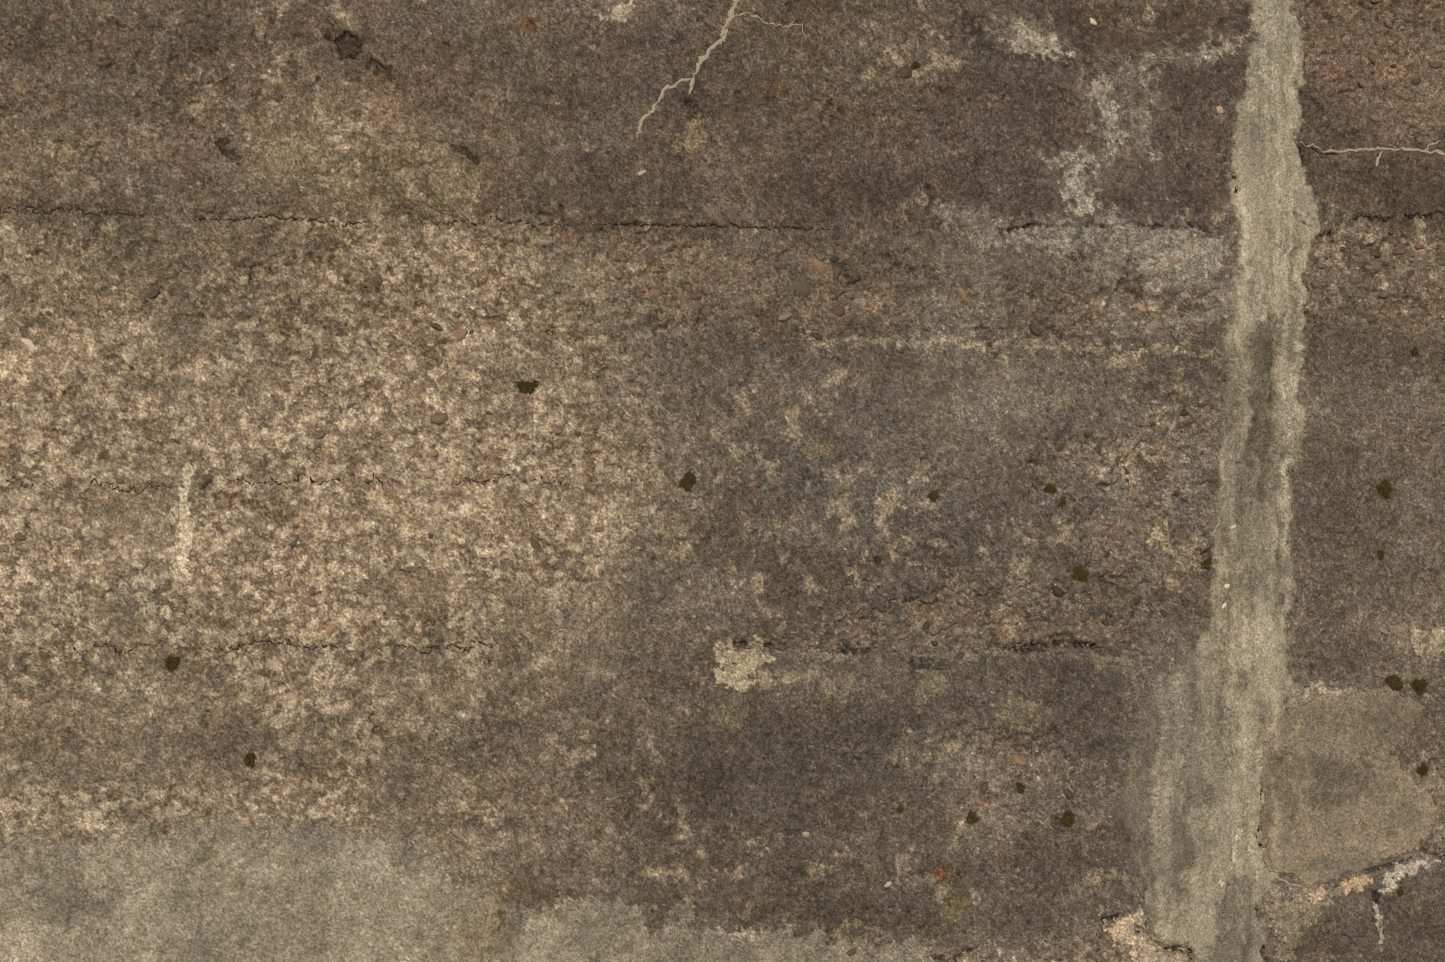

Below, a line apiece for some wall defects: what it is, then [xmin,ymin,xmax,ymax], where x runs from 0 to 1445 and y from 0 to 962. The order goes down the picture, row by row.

crack [636,0,806,139]
crack [1292,138,1445,166]
crack [0,205,159,221]
crack [193,214,379,227]
crack [415,215,847,231]
damp [805,0,1290,482]
crack [1292,210,1444,242]
damp [1252,268,1307,548]
crack [1003,640,1119,657]
damp [1268,679,1342,735]
damp [1215,804,1249,892]
crack [1256,789,1445,892]